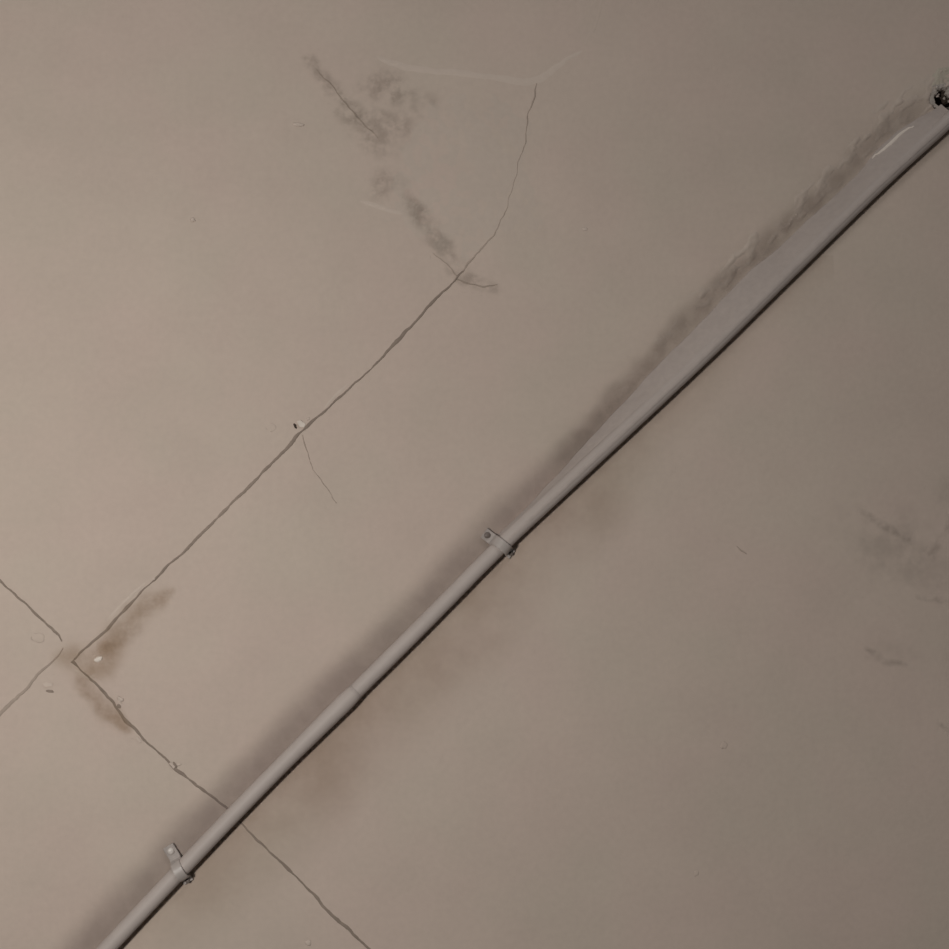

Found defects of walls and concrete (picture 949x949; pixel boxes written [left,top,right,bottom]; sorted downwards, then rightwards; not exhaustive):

crack [0,83,537,949]
crack [317,70,378,138]